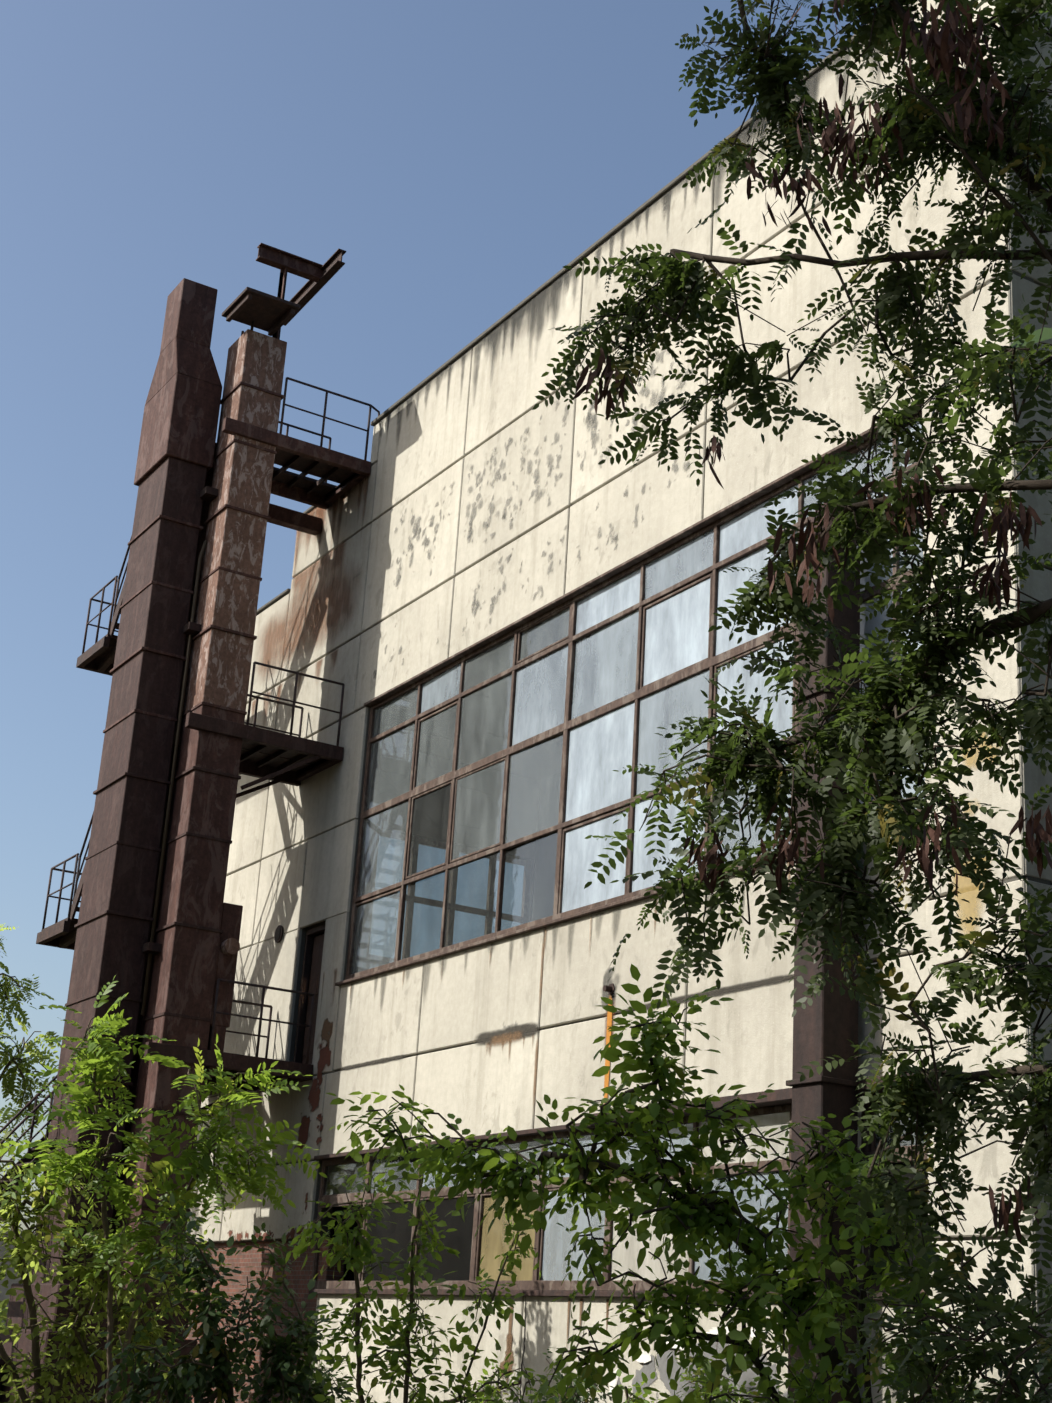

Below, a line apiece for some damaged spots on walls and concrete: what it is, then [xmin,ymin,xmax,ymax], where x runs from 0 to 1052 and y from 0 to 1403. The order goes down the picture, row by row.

water stain [783,47,851,116]
water stain [596,117,780,272]
water stain [380,266,579,435]
corrosion [262,476,368,669]
spalling [644,975,794,1010]
spalling [296,1044,404,1149]